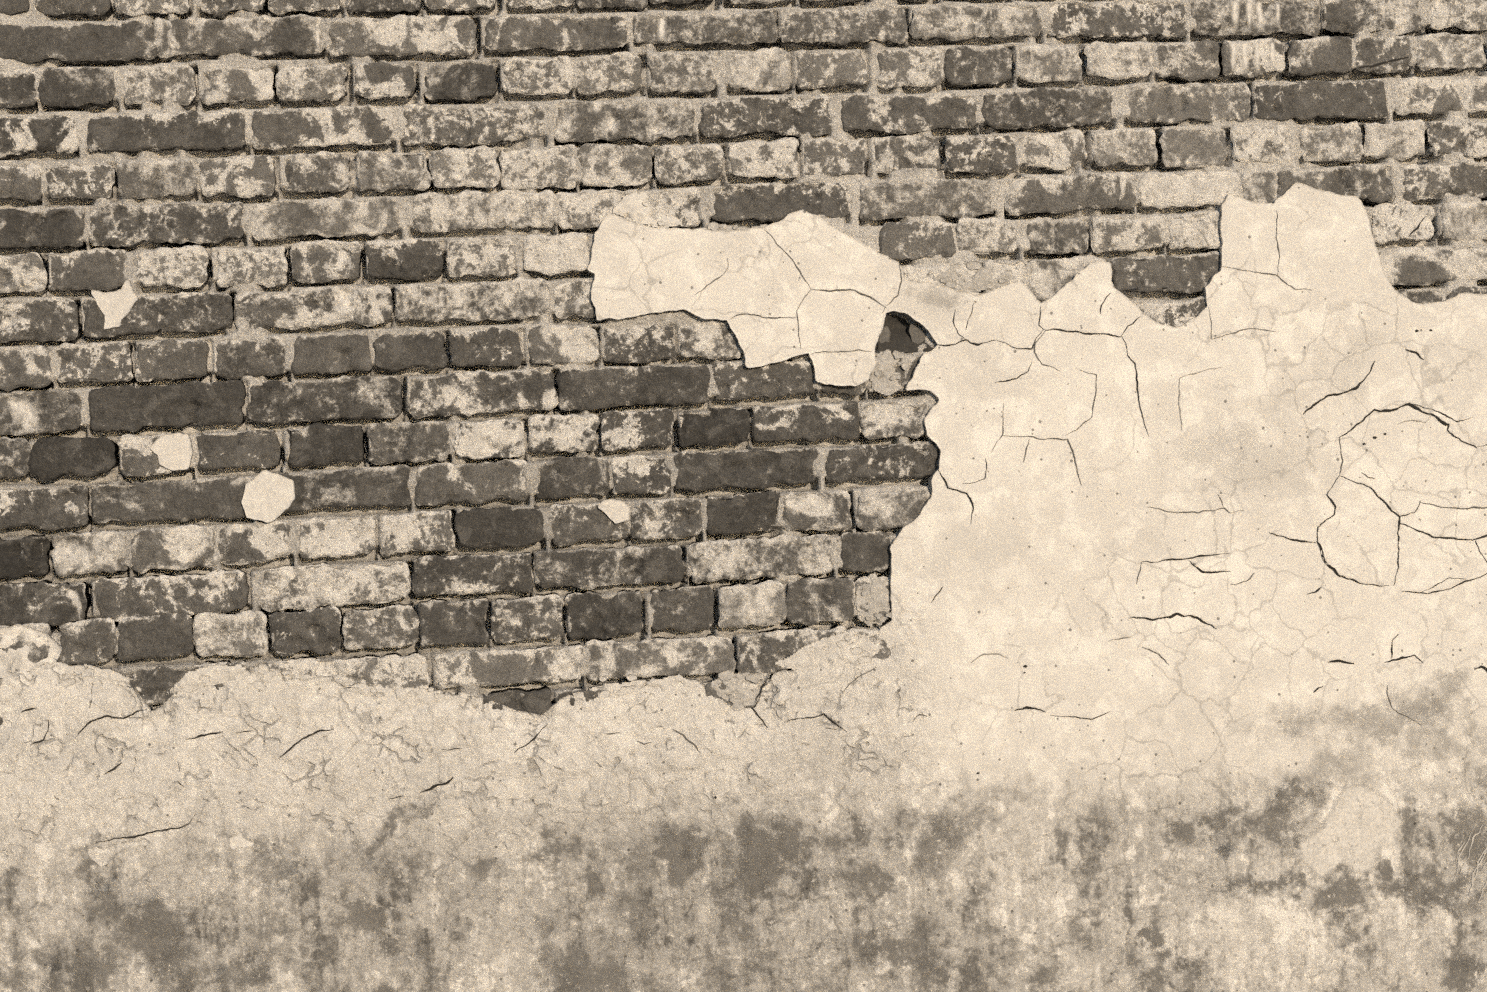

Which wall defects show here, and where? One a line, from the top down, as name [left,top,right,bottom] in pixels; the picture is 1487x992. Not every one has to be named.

crack [732,230,902,354]
spalling [870,314,933,396]
crack [935,294,1276,520]
crack [1151,349,1487,594]
peeling [26,661,145,716]
spalling [170,663,473,704]
spalling [589,572,892,711]
crack [1112,553,1254,665]
leakage [1165,756,1351,848]
leakage [656,801,800,945]
leakage [1229,796,1487,954]
leakage [1122,906,1201,992]